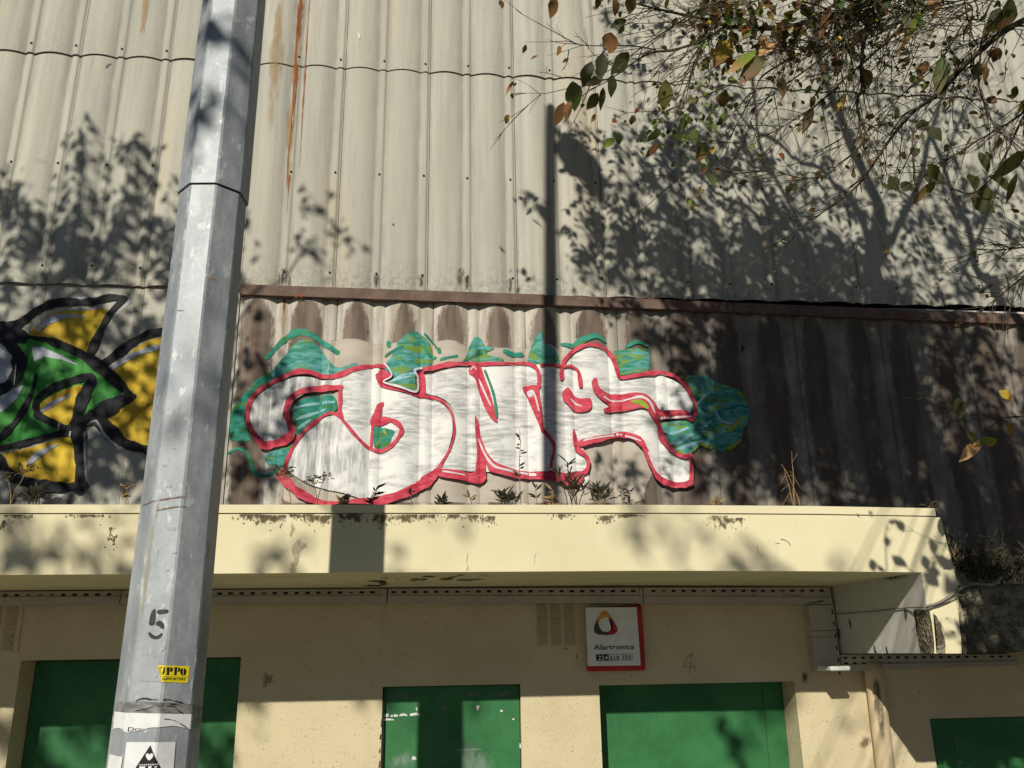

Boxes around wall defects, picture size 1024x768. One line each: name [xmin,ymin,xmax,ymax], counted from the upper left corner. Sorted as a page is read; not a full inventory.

corrosion [287,0,309,191]
leakage [596,514,646,525]